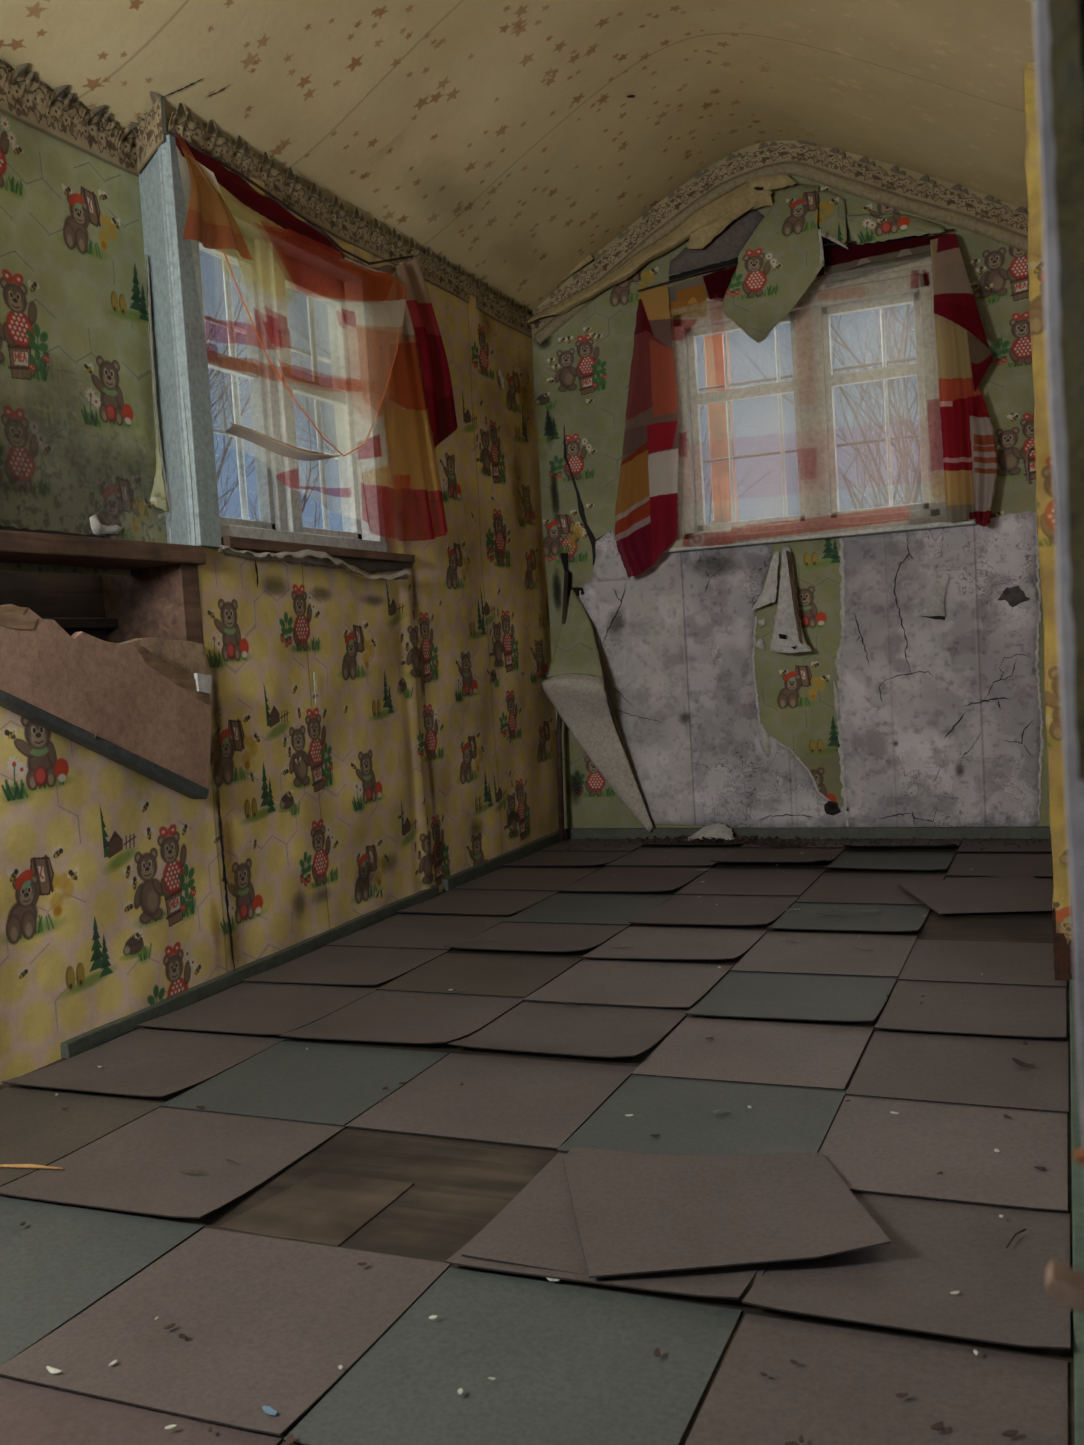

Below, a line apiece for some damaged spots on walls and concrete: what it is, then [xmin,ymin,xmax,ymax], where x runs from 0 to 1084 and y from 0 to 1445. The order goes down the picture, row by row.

peeling [669,209,764,275]
spalling [0,564,212,700]
peeling [579,511,1044,828]
crack [855,531,931,700]
crack [880,654,1032,824]